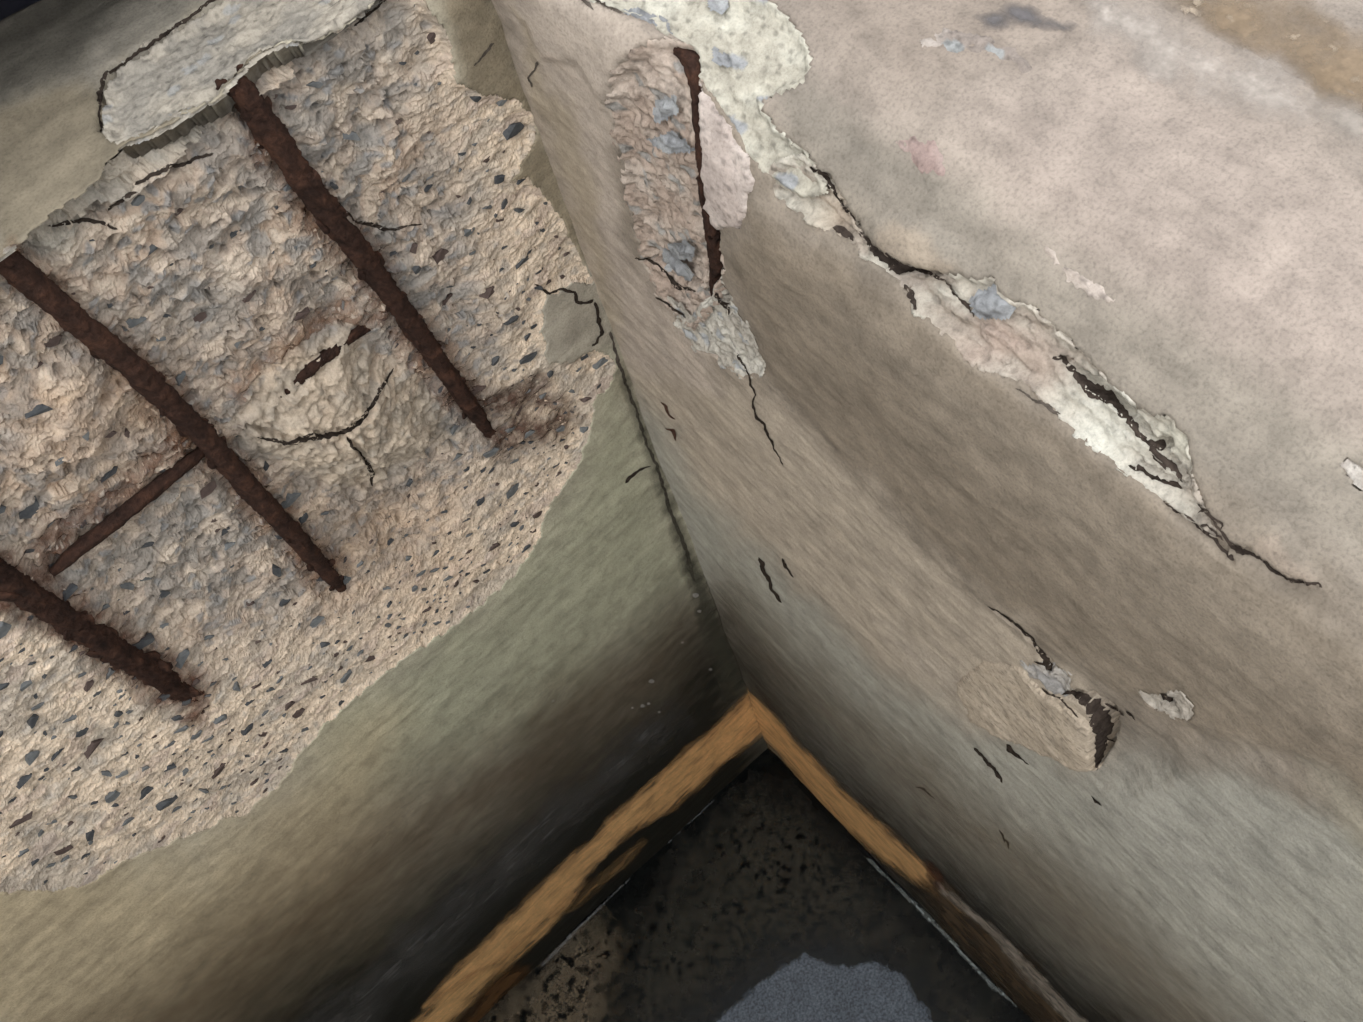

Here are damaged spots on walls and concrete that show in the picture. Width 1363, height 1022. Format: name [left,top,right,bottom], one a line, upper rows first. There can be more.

spalling [589,0,1216,537]
rust [0,436,190,595]
spalling [0,0,616,894]
peeling [1340,458,1363,490]
rust [0,597,207,722]
crack [987,606,1053,671]
peeling [1138,690,1194,721]